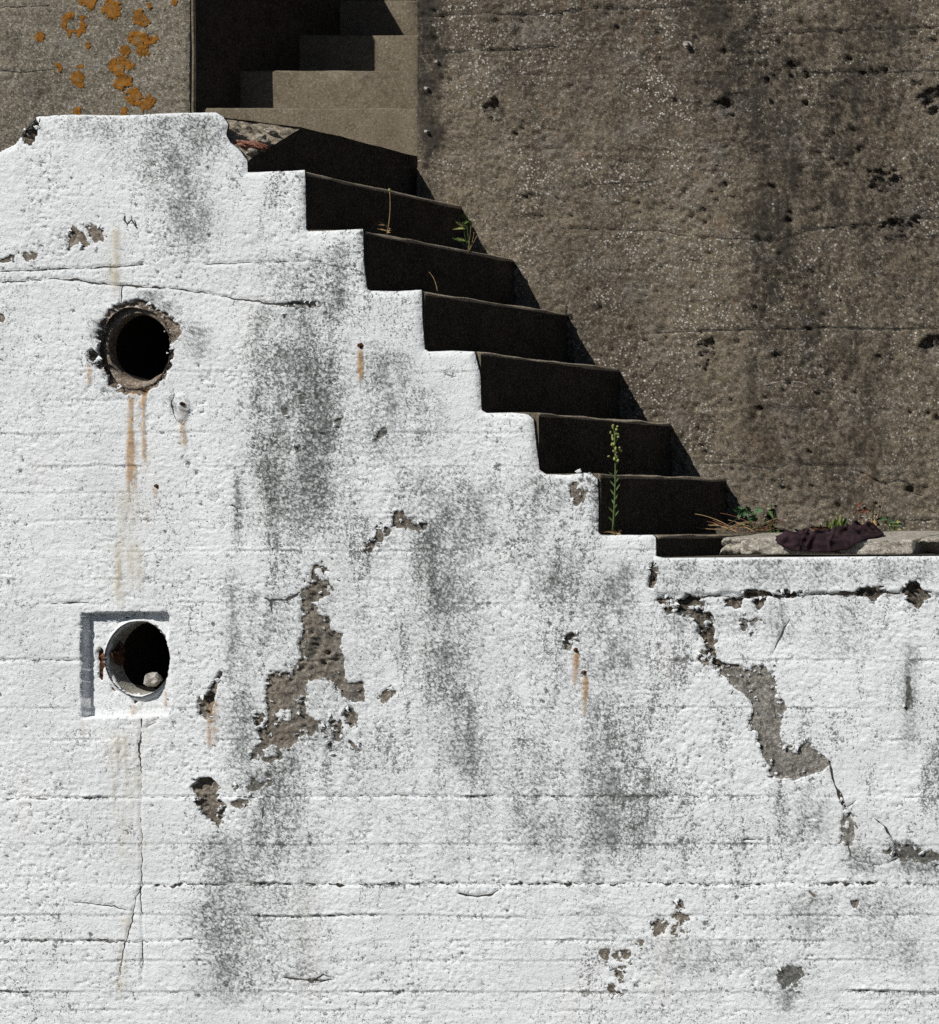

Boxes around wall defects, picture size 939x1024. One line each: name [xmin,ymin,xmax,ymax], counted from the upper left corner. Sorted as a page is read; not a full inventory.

peeling [66,222,107,252]
crack [3,264,314,307]
corrosion [127,389,148,488]
peeling [363,509,428,555]
peeling [192,561,397,830]
water stain [178,246,449,1005]
corrosion [573,654,587,713]
peeling [648,559,829,781]
crack [828,760,853,807]
crack [0,718,794,989]
crack [822,819,937,886]
peeling [599,898,691,999]